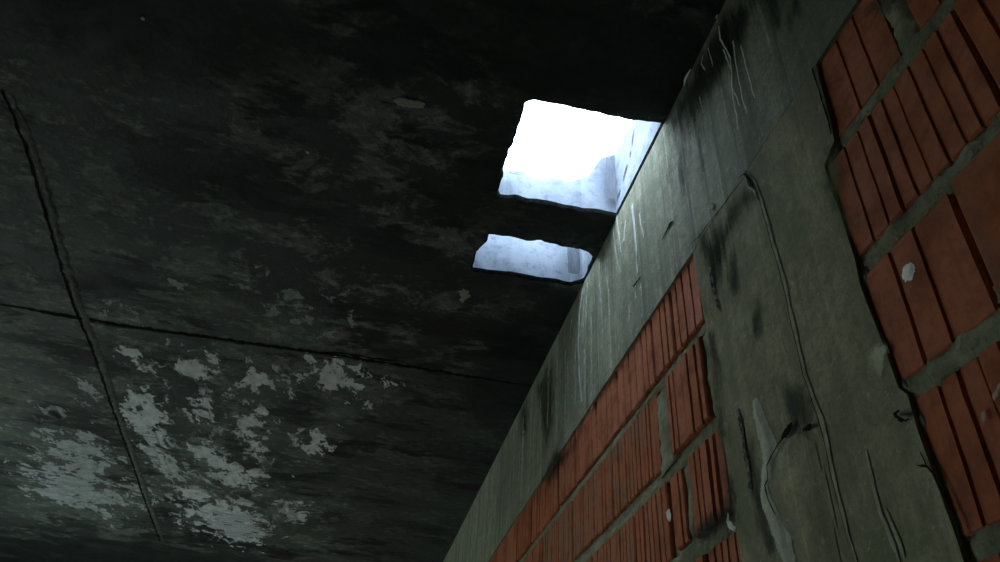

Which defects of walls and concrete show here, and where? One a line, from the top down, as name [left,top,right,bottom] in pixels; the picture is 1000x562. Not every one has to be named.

leakage [672,0,755,131]
peeling [0,338,405,554]
crack [0,90,530,542]
crack [690,172,857,562]